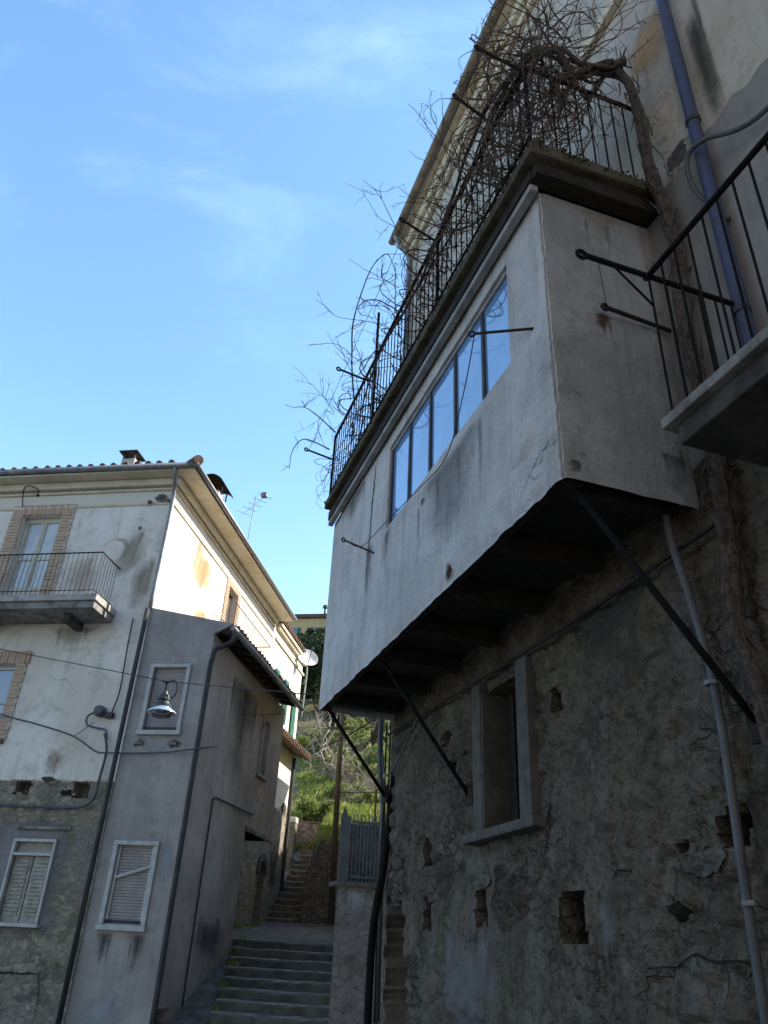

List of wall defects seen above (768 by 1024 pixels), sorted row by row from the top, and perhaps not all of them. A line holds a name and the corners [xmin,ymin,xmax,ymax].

leakage [689,0,718,104]
crack [521,425,556,496]
leakage [196,542,209,585]
spalling [475,859,529,932]
spalling [666,895,699,935]
crack [637,945,751,1023]